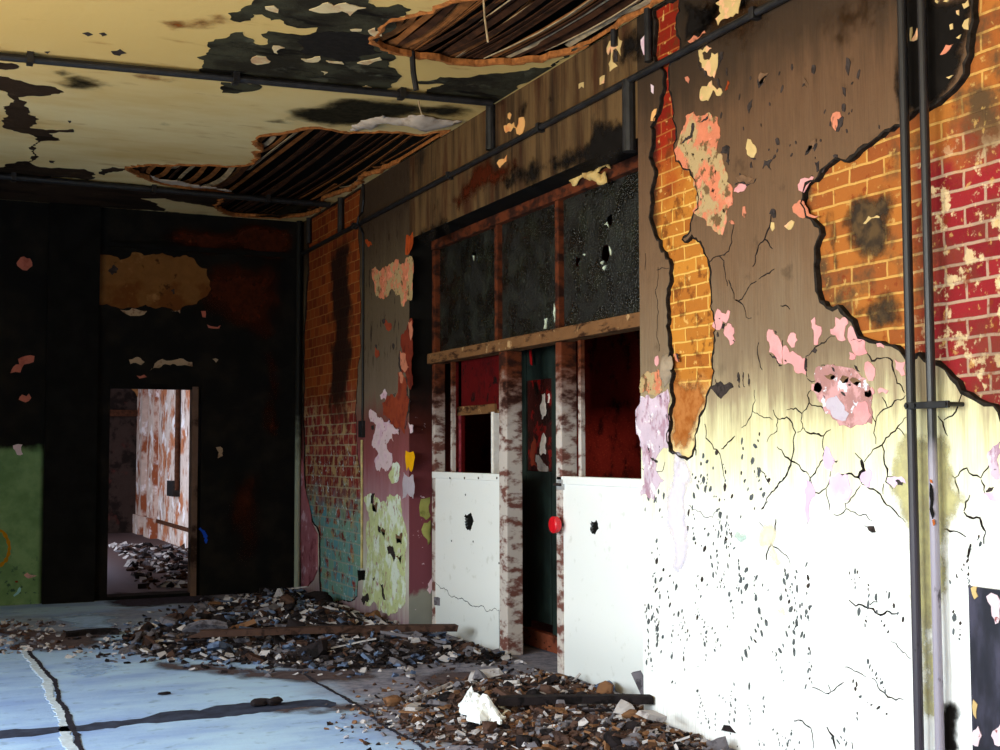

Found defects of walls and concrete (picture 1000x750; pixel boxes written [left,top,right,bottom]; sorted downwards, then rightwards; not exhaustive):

leakage [292,99,464,125]
crack [709,215,774,319]
leakage [827,196,892,257]
flaking render [0,62,451,616]
flaking render [197,0,1000,689]
crack [695,336,906,562]
leakage [667,454,690,571]
crack [945,465,989,558]
crack [849,600,897,616]
leakage [892,434,960,716]
crack [794,720,853,749]
crack [812,666,903,701]